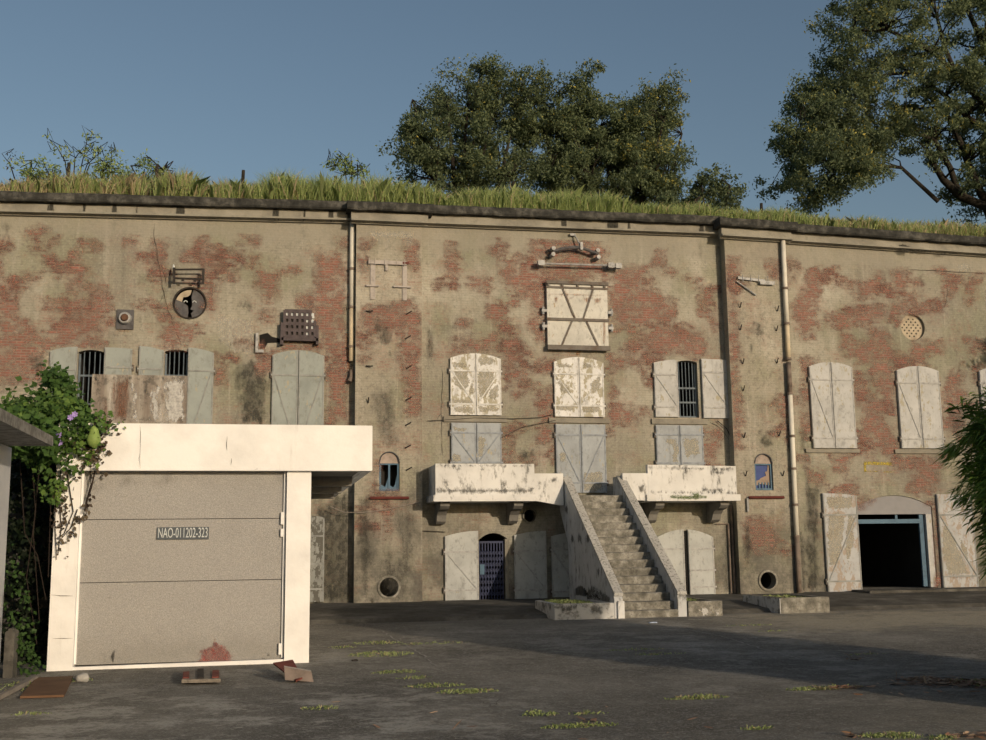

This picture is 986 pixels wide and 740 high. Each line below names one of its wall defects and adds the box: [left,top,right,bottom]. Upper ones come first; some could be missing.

peeling [0,228,113,385]
peeling [150,379,184,422]
peeling [180,236,302,310]
water stain [237,361,265,421]
peeling [235,238,422,425]
peeling [433,237,706,464]
peeling [768,356,812,447]
peeling [793,267,983,587]